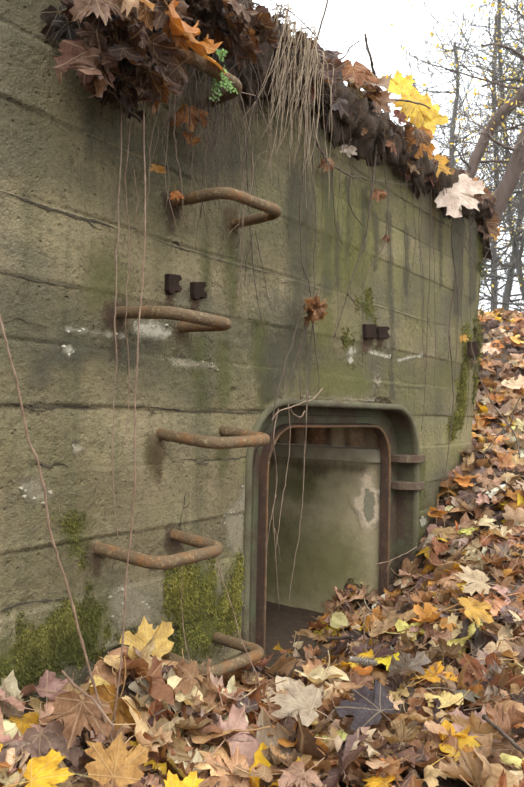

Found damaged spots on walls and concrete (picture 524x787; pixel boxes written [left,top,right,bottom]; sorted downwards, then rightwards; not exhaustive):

crack [0,191,114,230]
crack [1,272,85,290]
crack [136,232,325,292]
peeling [351,472,380,531]
corrosion [165,528,182,551]